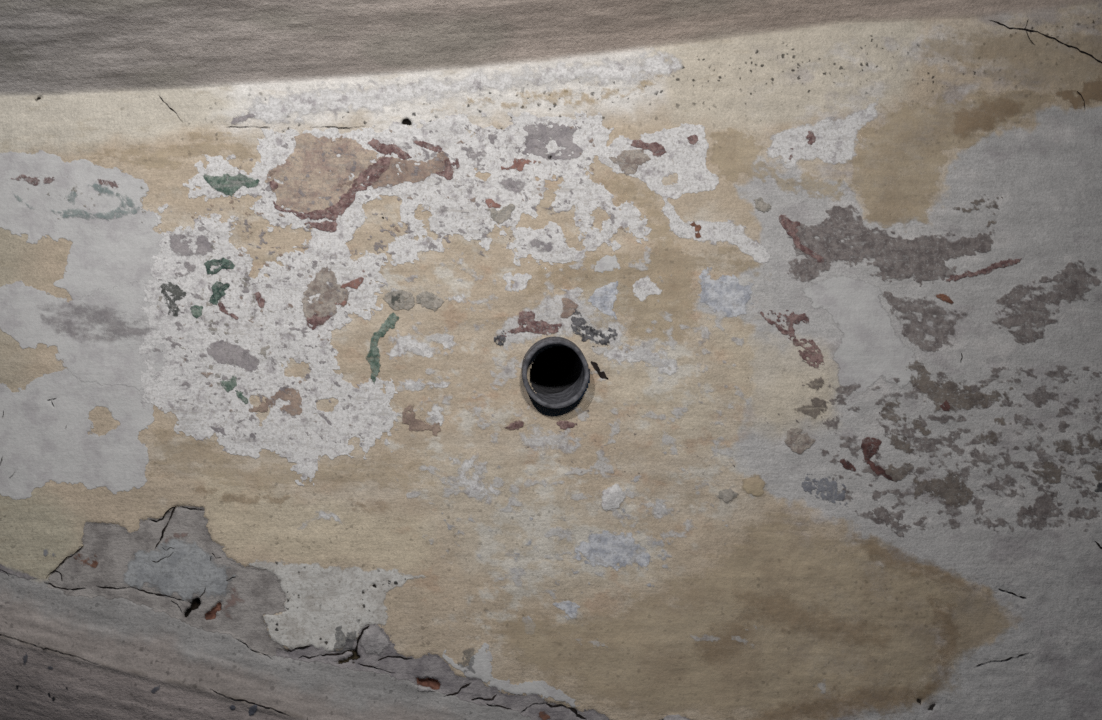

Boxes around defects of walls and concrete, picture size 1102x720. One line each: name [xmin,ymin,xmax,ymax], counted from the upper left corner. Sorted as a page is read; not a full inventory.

crack [991,20,1102,63]
leakage [711,80,1102,228]
peeling [0,48,772,512]
peeling [802,275,919,393]
peeling [889,435,913,454]
crack [45,545,233,612]
crack [149,505,204,562]
spalling [0,505,610,720]
crack [238,625,411,673]
crack [445,683,586,719]
peeling [498,476,693,586]
leakage [504,514,944,715]